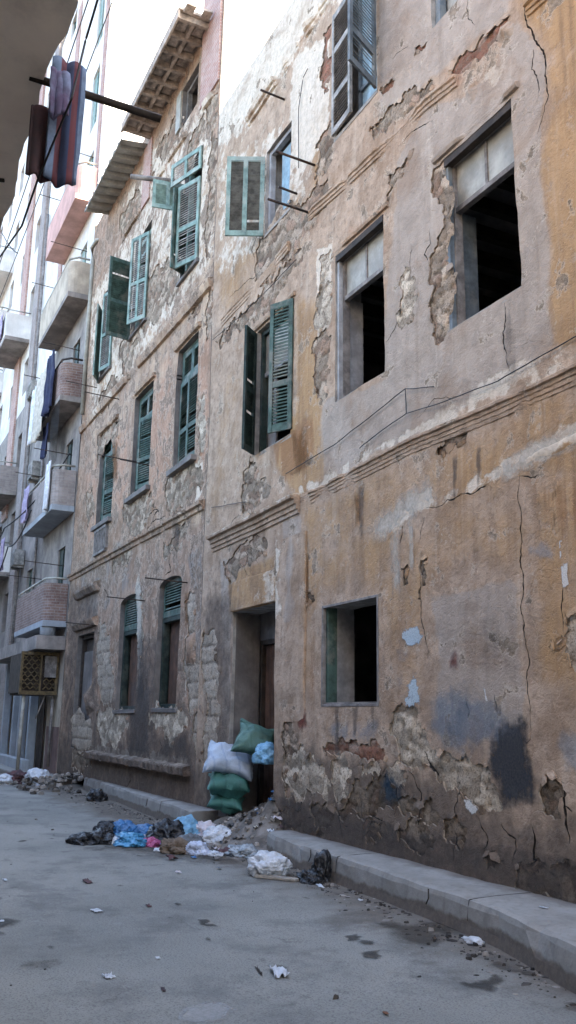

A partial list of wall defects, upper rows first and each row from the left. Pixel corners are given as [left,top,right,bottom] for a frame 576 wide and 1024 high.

spalling [447,13,510,75]
crack [525,15,547,82]
spalling [369,80,434,139]
spalling [193,117,344,349]
spalling [396,162,458,346]
spalling [313,250,333,401]
spalling [241,456,271,515]
spalling [224,535,268,584]
peeling [402,626,423,646]
spalling [280,676,503,856]
water stain [489,718,534,806]
spalling [540,770,567,820]